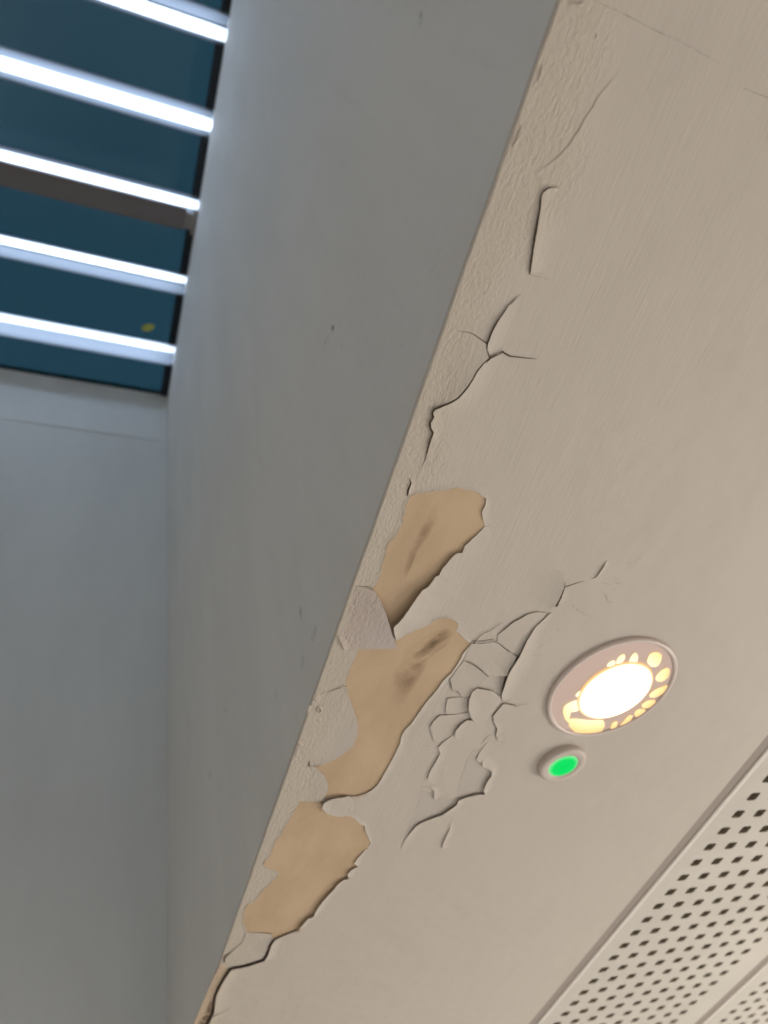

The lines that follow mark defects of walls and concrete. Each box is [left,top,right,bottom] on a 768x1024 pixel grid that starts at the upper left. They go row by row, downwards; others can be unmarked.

crack [407,296,532,496]
peeling [240,480,558,939]